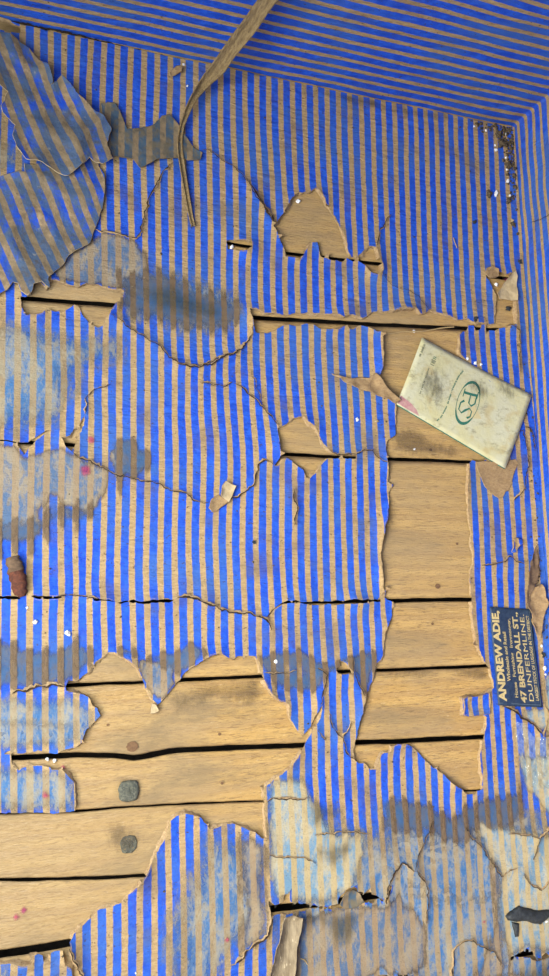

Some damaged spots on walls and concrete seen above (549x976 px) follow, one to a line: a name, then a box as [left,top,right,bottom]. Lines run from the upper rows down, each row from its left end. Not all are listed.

peeling [273,187,384,275]
peeling [250,301,518,364]
crack [70,449,206,504]
crack [231,458,274,499]
peeling [274,415,345,478]
peeling [323,420,397,605]
crack [56,592,97,600]
crack [177,593,272,630]
peeling [459,464,494,790]
peeling [353,744,443,774]
peeling [0,652,323,976]
peeling [271,886,392,917]